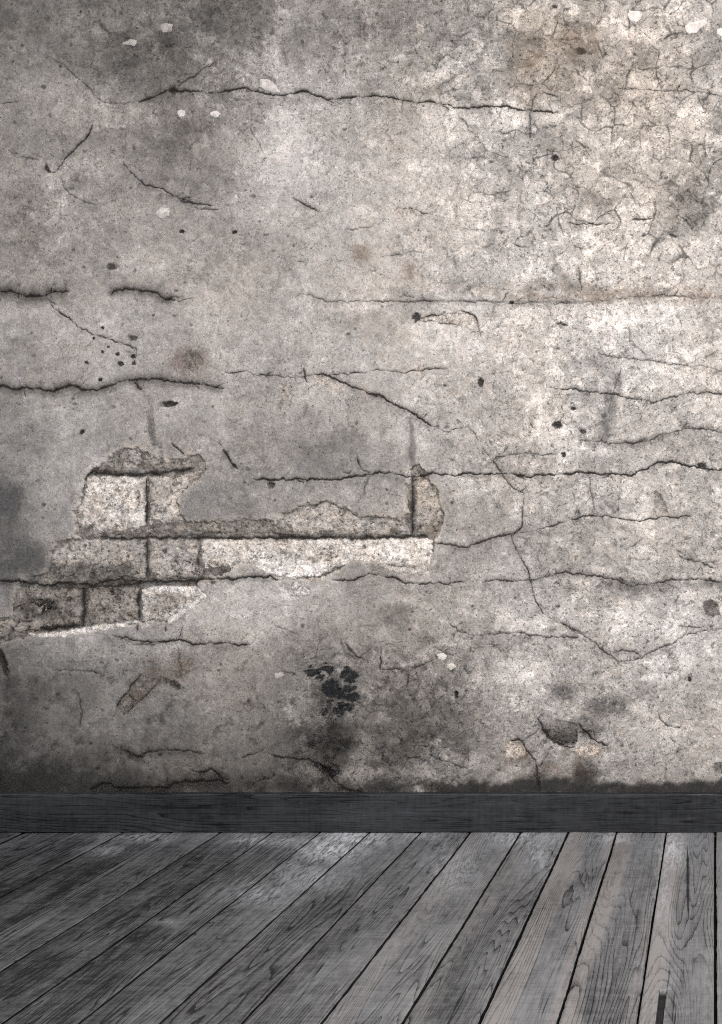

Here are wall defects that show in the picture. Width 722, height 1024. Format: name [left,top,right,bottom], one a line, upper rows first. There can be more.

crack [139,63,555,137]
crack [0,287,722,662]
spalling [0,447,444,675]
leakage [304,662,360,717]
leakage [423,763,722,793]